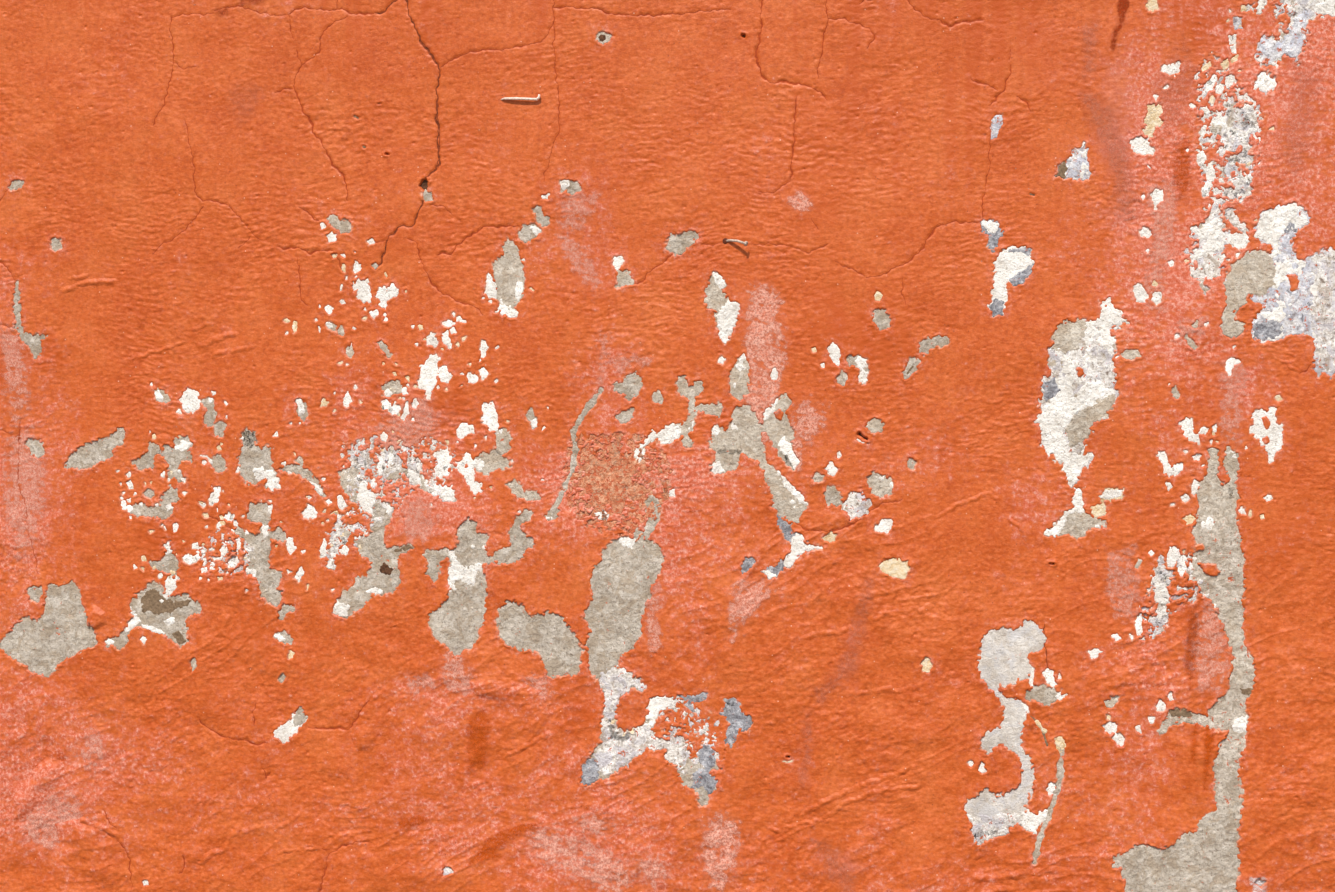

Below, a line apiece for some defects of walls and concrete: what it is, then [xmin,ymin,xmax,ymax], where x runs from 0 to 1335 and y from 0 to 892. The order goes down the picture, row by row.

crack [153,0,875,315]
spalling [482,180,582,318]
crack [754,142,991,304]
crack [907,0,982,27]
crack [971,50,1031,111]
spalling [980,219,1035,317]
spalling [1130,0,1335,380]
spalling [0,271,837,806]
spalling [812,451,894,534]
spalling [964,620,1068,848]
spalling [1034,297,1142,540]
spalling [1102,395,1283,892]